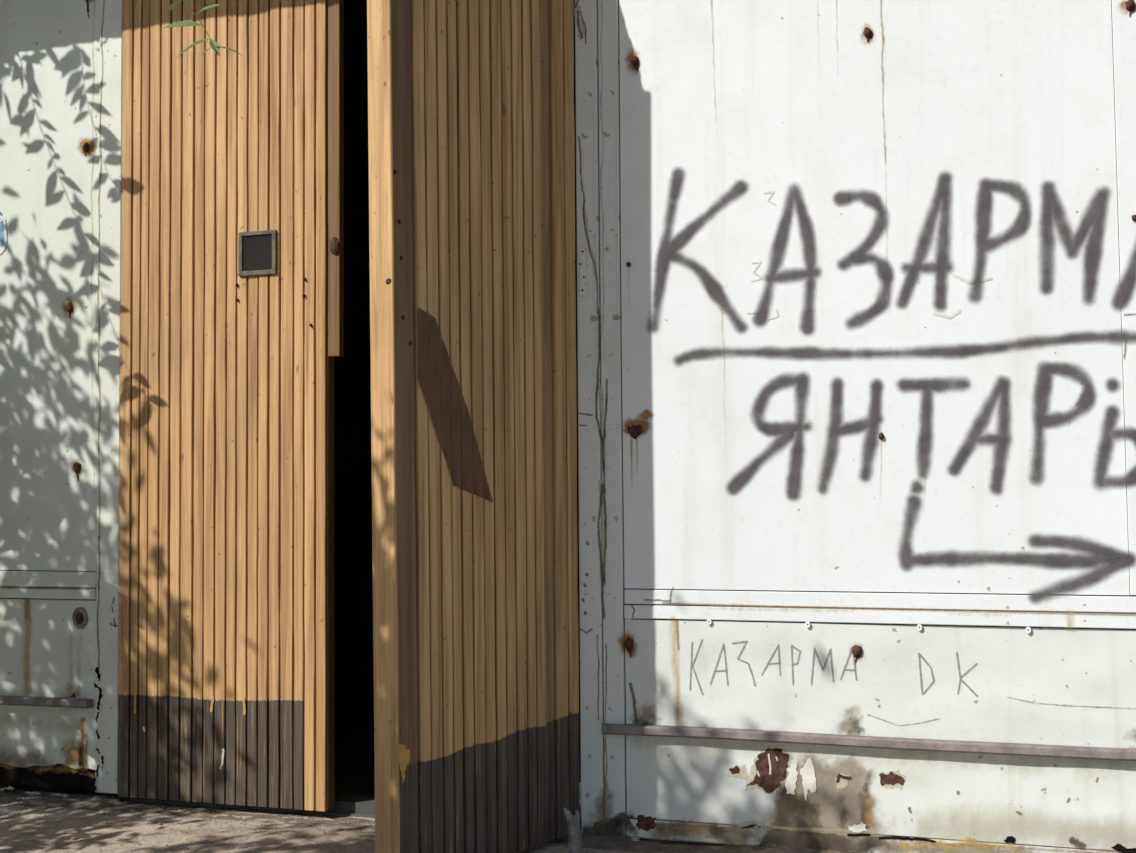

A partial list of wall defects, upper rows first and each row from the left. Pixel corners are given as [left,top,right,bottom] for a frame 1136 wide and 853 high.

corrosion [627,51,640,71]
corrosion [80,139,95,156]
corrosion [624,410,652,459]
corrosion [0,587,89,693]
corrosion [620,633,636,657]
corrosion [0,718,96,791]
peeling [727,747,817,801]
peeling [835,772,851,789]
peeling [879,770,906,790]
corrosion [582,798,749,837]
water stain [760,758,888,853]